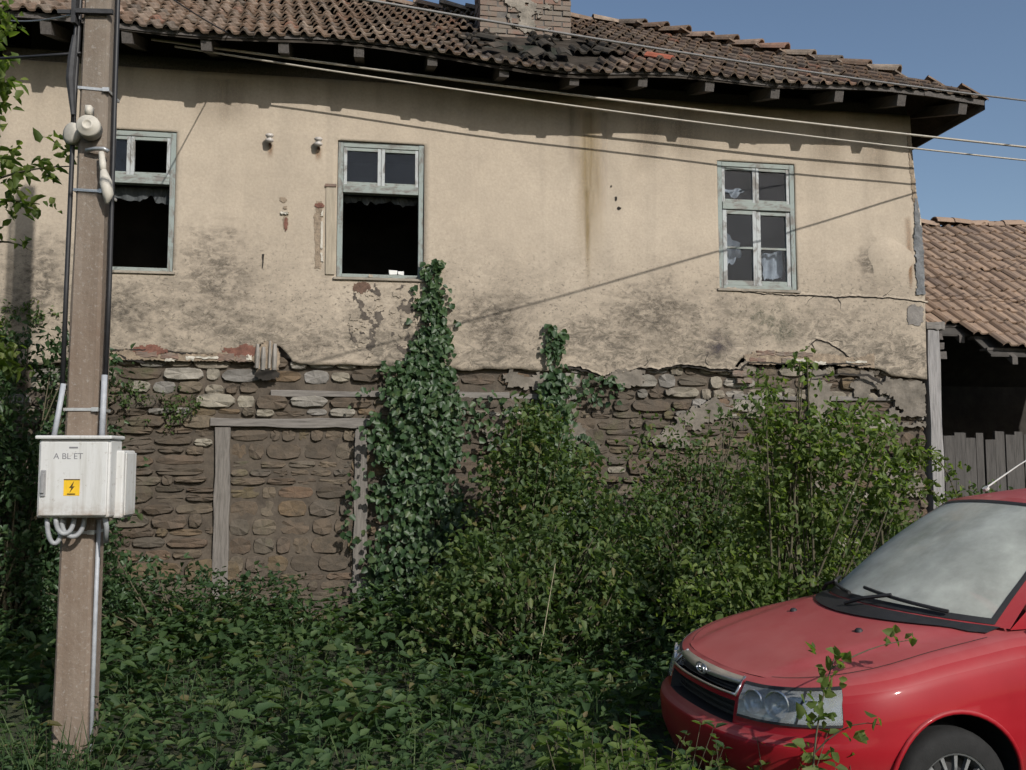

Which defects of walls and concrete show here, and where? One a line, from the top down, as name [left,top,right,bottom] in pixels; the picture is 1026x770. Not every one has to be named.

peeling [314,201,325,269]
peeling [348,274,423,359]
crack [727,287,928,309]
spalling [110,343,256,363]
peeling [502,369,547,390]
peeling [603,369,645,389]
peeling [729,350,927,428]
peeling [564,399,601,449]
peeling [649,397,736,449]
peeling [875,460,927,498]